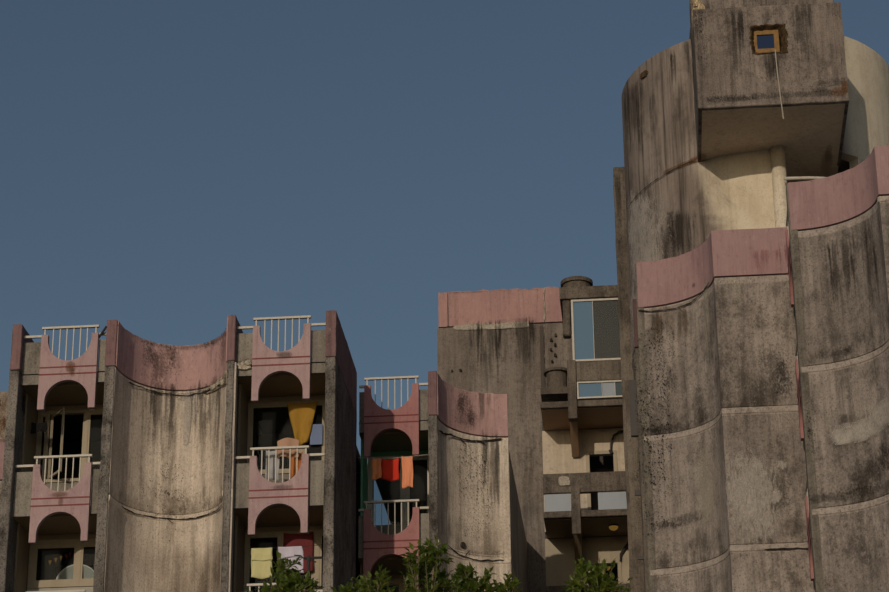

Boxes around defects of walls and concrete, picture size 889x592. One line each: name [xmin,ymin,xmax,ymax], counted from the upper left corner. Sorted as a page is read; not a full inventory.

spalling [691,0,708,69]
crack [626,160,695,211]
water stain [628,190,668,360]
water stain [726,453,786,545]